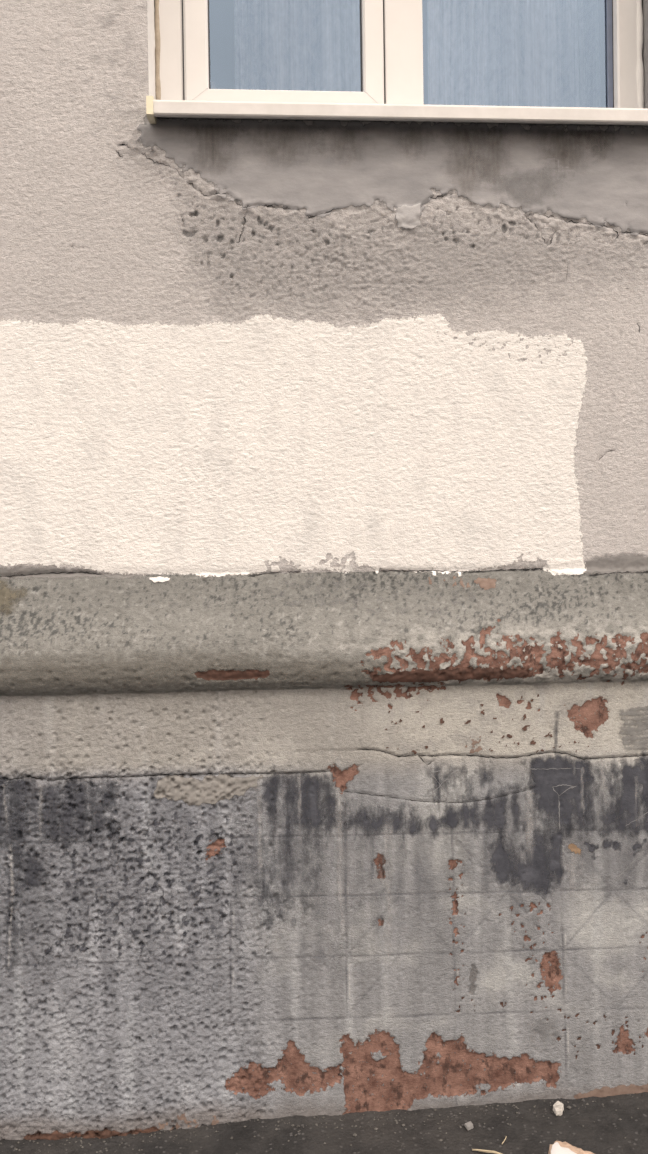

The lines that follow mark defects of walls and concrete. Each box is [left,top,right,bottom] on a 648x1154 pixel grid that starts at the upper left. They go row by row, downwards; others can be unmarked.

flaking render [191,206,244,279]
peeling [194,669,270,681]
peeling [344,619,648,753]
crack [0,771,536,803]
leakage [259,724,648,895]
crack [357,749,646,765]
leakage [0,777,243,967]
peeling [448,859,477,1012]
peeling [499,900,607,1041]
peeling [225,1029,562,1115]
peeling [596,1017,648,1055]